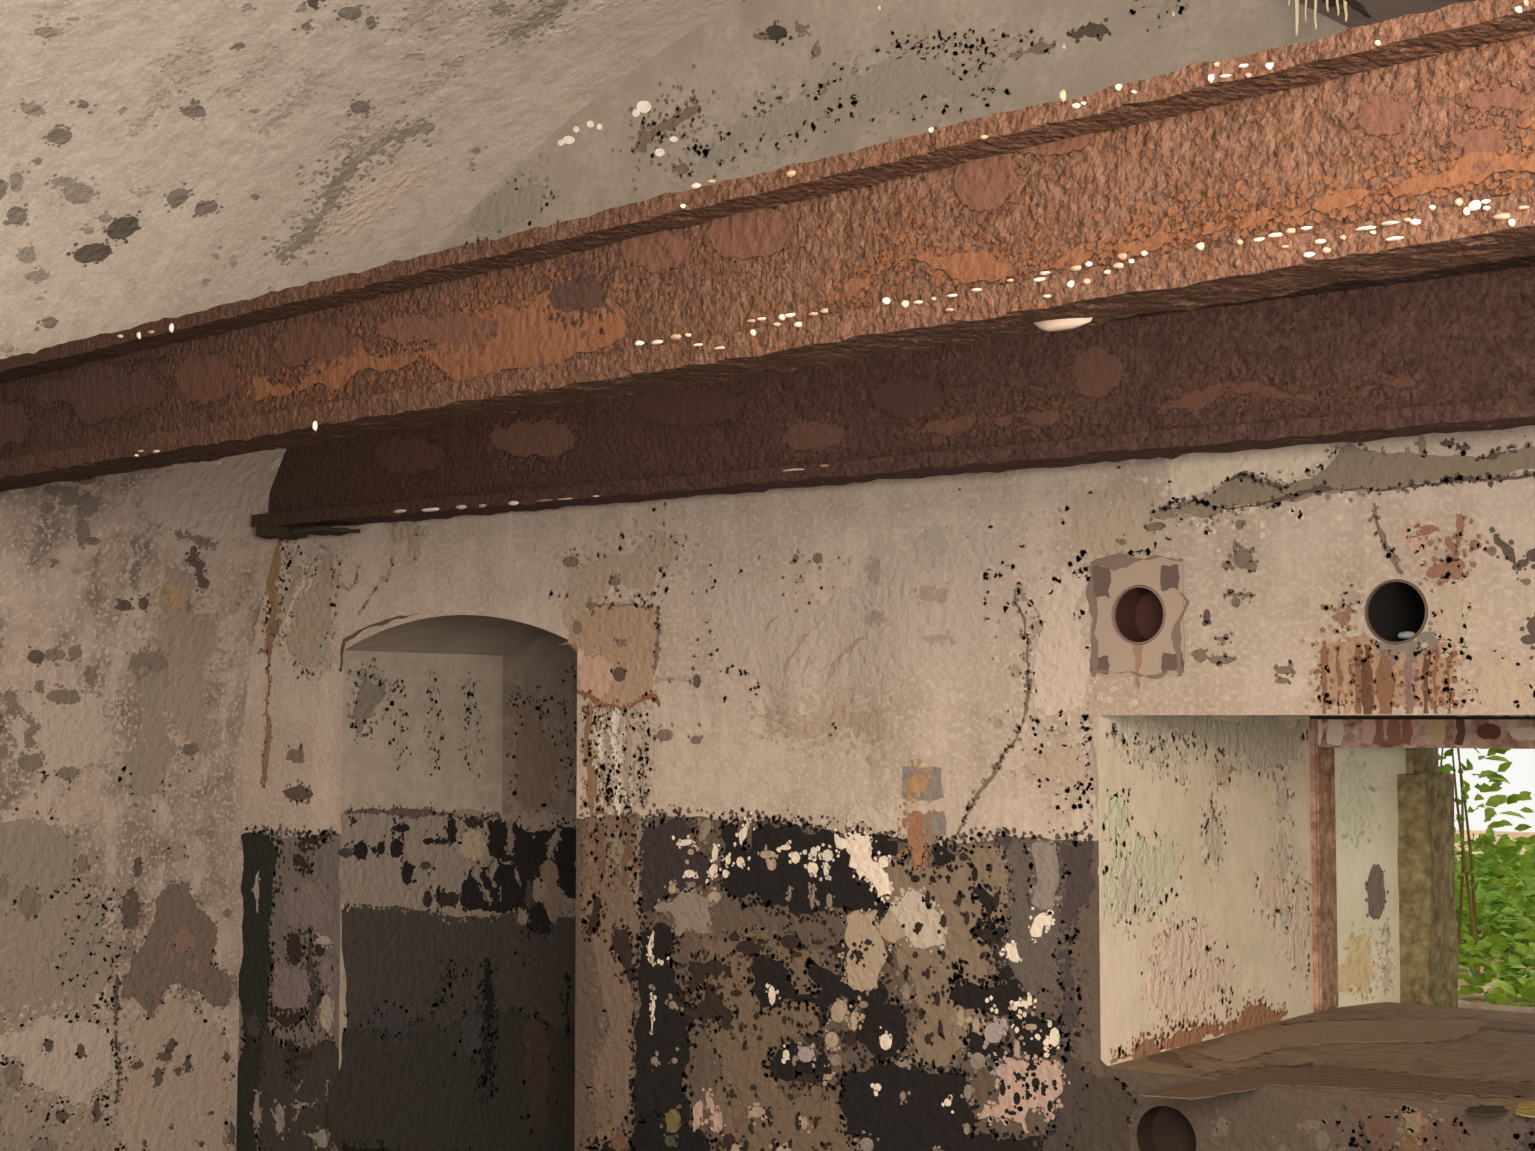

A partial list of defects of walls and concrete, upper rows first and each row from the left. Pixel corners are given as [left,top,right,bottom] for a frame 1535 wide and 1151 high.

leakage [0,98,223,331]
leakage [118,35,337,145]
leakage [262,0,618,266]
corrosion [169,208,805,422]
leakage [635,333,725,350]
spalling [1144,435,1535,608]
corrosion [1394,523,1477,593]
crack [948,581,1066,845]
corrosion [1301,576,1535,746]
spalling [651,797,948,1151]
spalling [999,838,1063,963]
spalling [941,992,1071,1135]